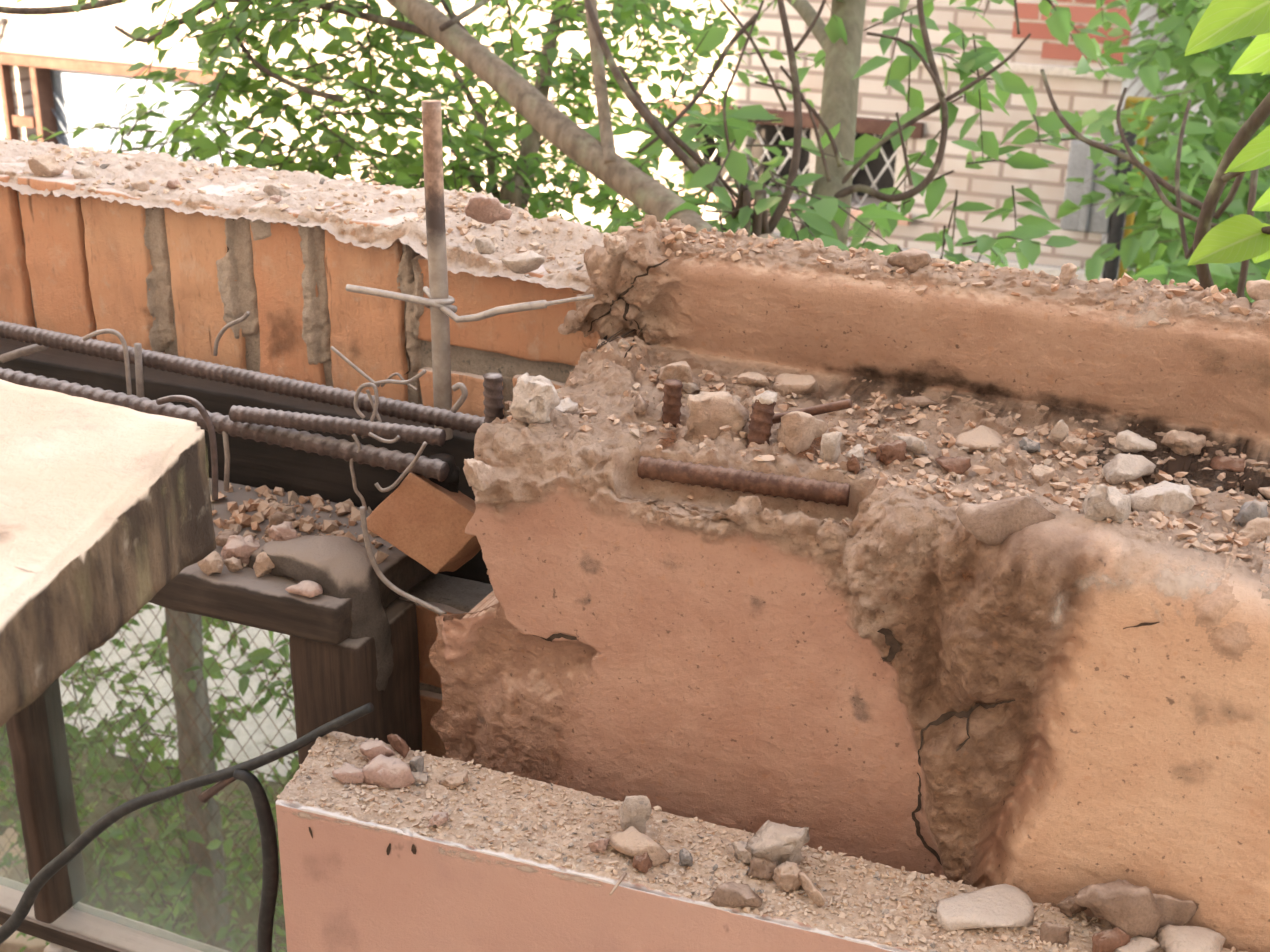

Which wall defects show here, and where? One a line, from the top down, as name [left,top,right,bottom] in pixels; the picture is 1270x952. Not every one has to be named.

crack [588,259,668,358]
corrosion [660,430,677,449]
spalling [637,456,850,507]
corrosion [782,436,822,459]
flaking render [441,590,499,662]
crack [912,700,1015,865]